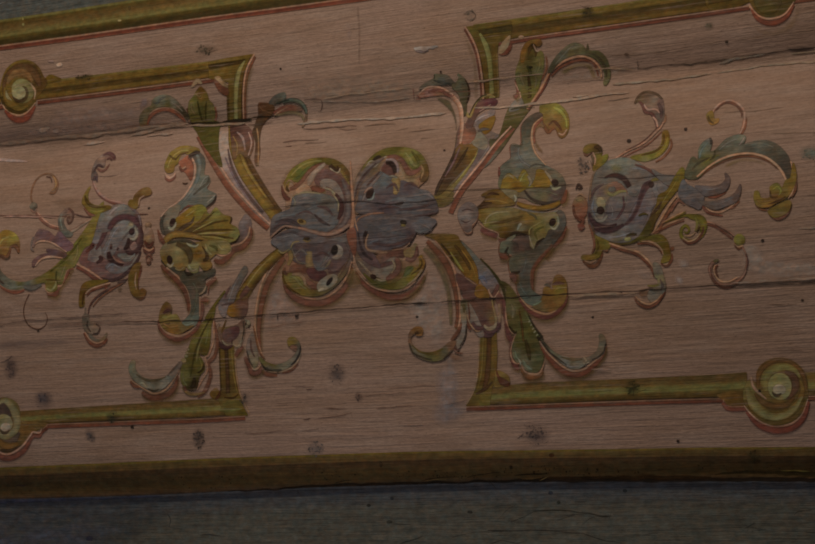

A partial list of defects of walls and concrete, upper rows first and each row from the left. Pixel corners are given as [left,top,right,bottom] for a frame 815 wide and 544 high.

crack [587,30,815,99]
crack [188,116,277,128]
crack [253,184,572,211]
crack [1,277,815,331]